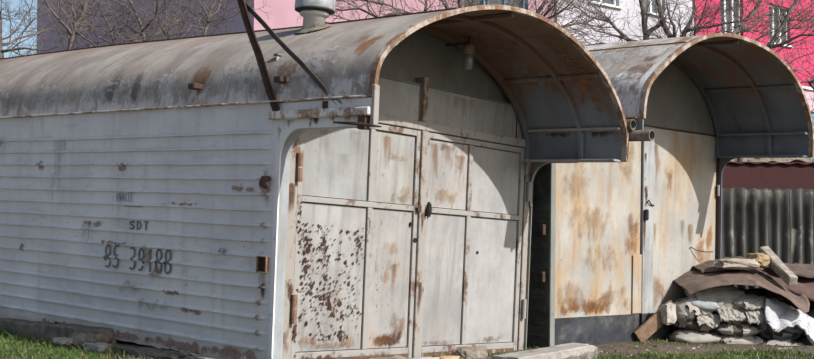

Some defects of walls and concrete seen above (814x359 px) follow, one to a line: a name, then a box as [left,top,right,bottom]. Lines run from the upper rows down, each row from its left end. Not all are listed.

water stain [131,75,143,102]
corrosion [357,5,629,162]
corrosion [626,217,646,313]
corrosion [562,299,608,314]
corrosion [374,319,404,346]